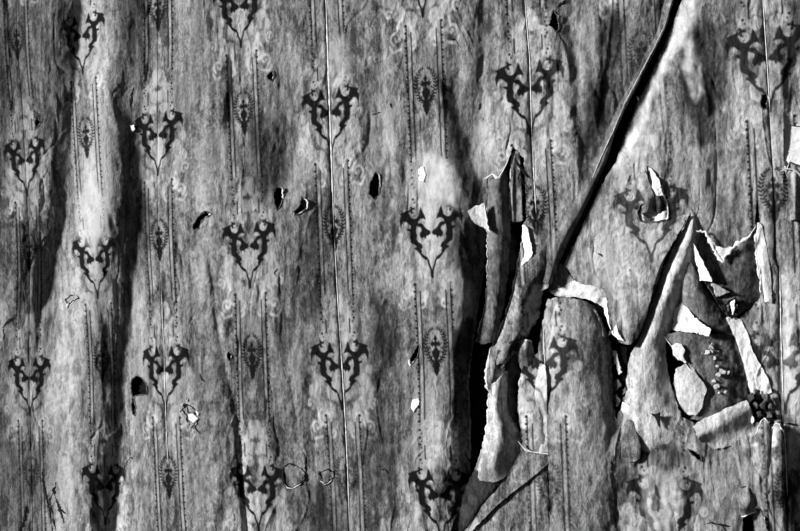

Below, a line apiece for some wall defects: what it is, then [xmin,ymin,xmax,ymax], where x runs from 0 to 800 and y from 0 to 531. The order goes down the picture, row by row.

flaking render [784,124,800,174]
flaking render [193,211,210,231]
flaking render [274,187,284,209]
flaking render [294,198,309,214]
flaking render [369,173,381,199]
peeling [509,150,523,222]
flaking render [638,167,669,222]
peeling [550,280,625,341]
peeling [665,222,773,450]
flaking render [131,376,147,415]
peeling [465,450,549,531]
flaking render [743,514,753,531]